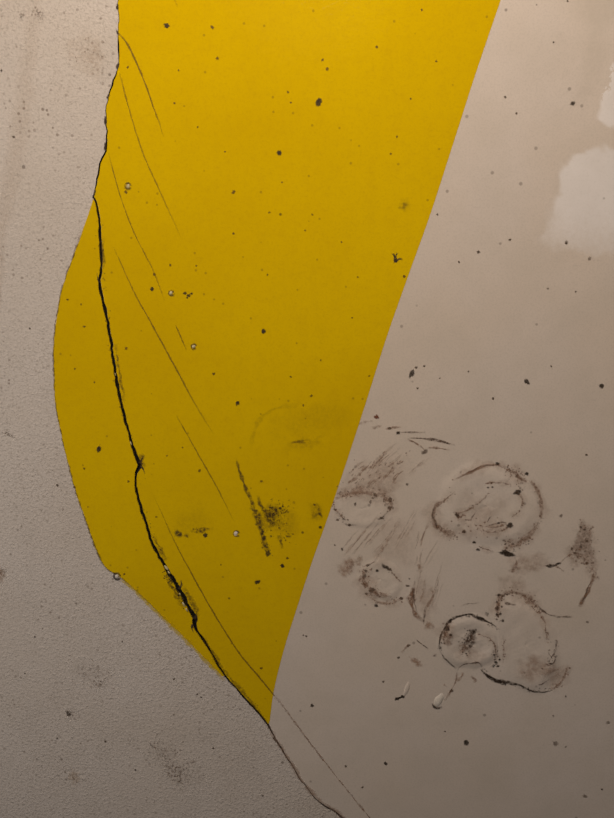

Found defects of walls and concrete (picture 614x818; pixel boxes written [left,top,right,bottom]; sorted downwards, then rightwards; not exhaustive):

peeling [594,61,614,130]
peeling [532,141,614,263]
crack [92,3,343,818]